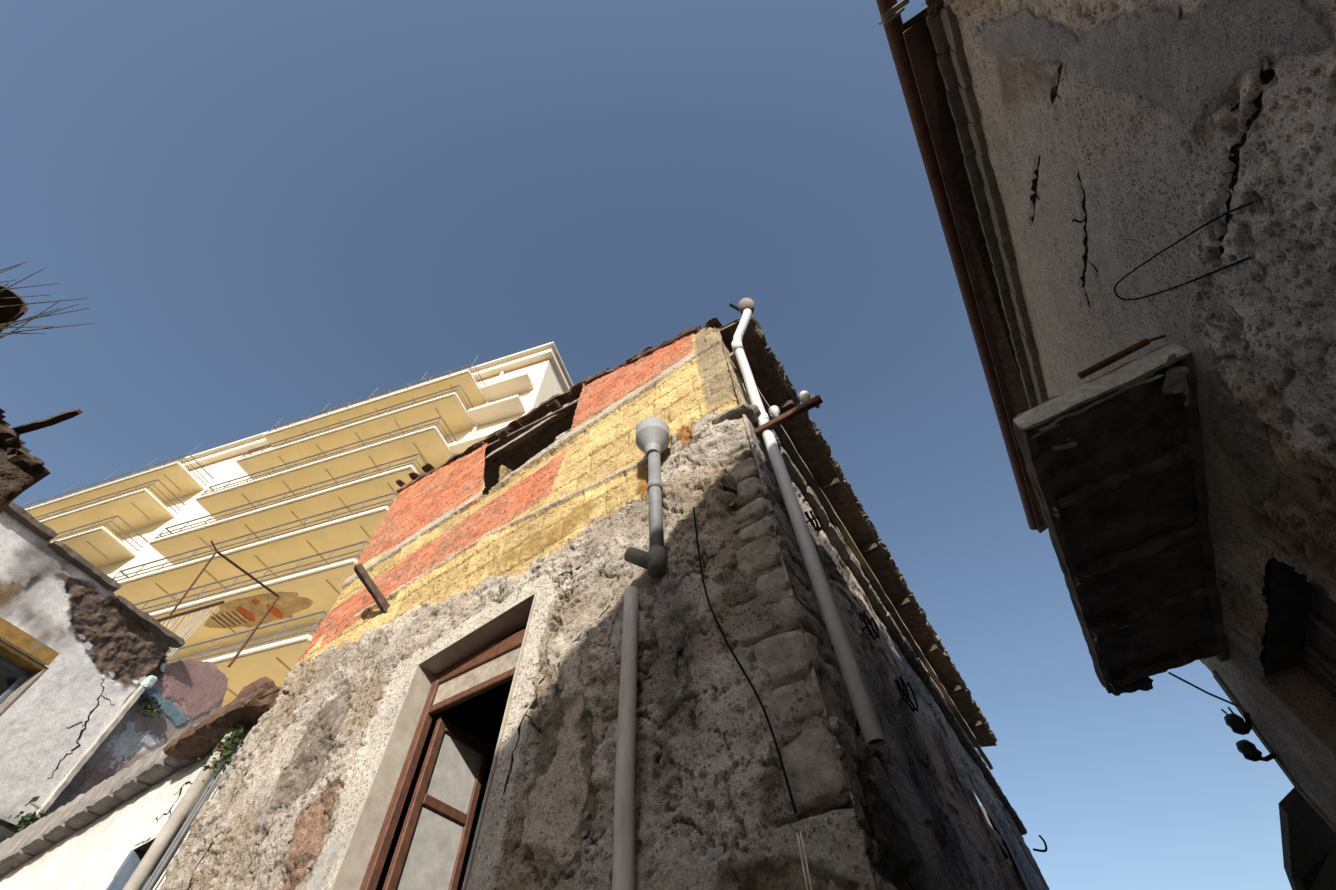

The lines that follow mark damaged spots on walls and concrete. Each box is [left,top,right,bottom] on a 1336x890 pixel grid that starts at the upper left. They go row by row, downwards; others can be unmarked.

flaking render [55,572,229,726]
spalling [204,592,313,628]
crack [47,678,115,779]
peeling [68,720,159,799]